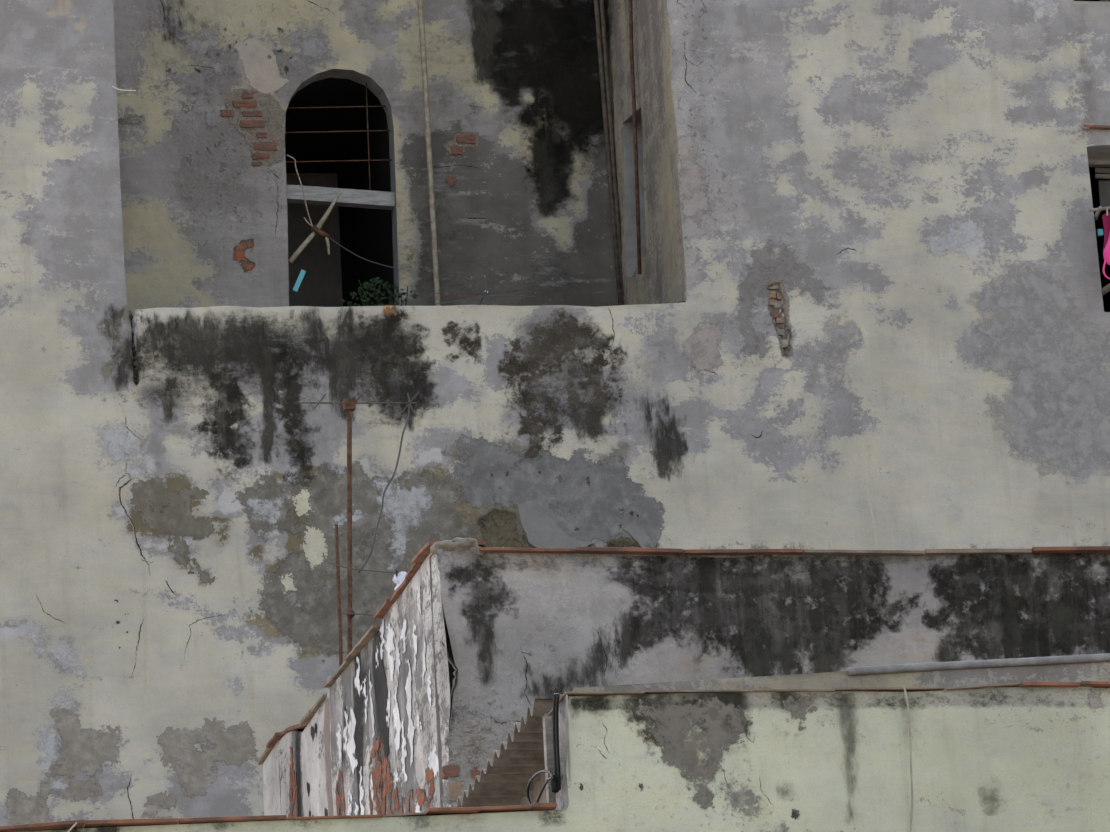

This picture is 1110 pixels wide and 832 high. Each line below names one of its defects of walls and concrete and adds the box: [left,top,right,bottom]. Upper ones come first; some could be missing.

flaking render [220,37,291,167]
leakage [470,0,605,216]
crack [129,315,140,384]
leakage [105,306,486,486]
leakage [499,308,627,459]
crack [104,416,175,594]
peeling [130,477,218,585]
peeling [233,434,666,817]
leakage [446,558,515,683]
leakage [525,544,1110,712]
peeling [4,686,122,826]
peeling [144,717,259,818]